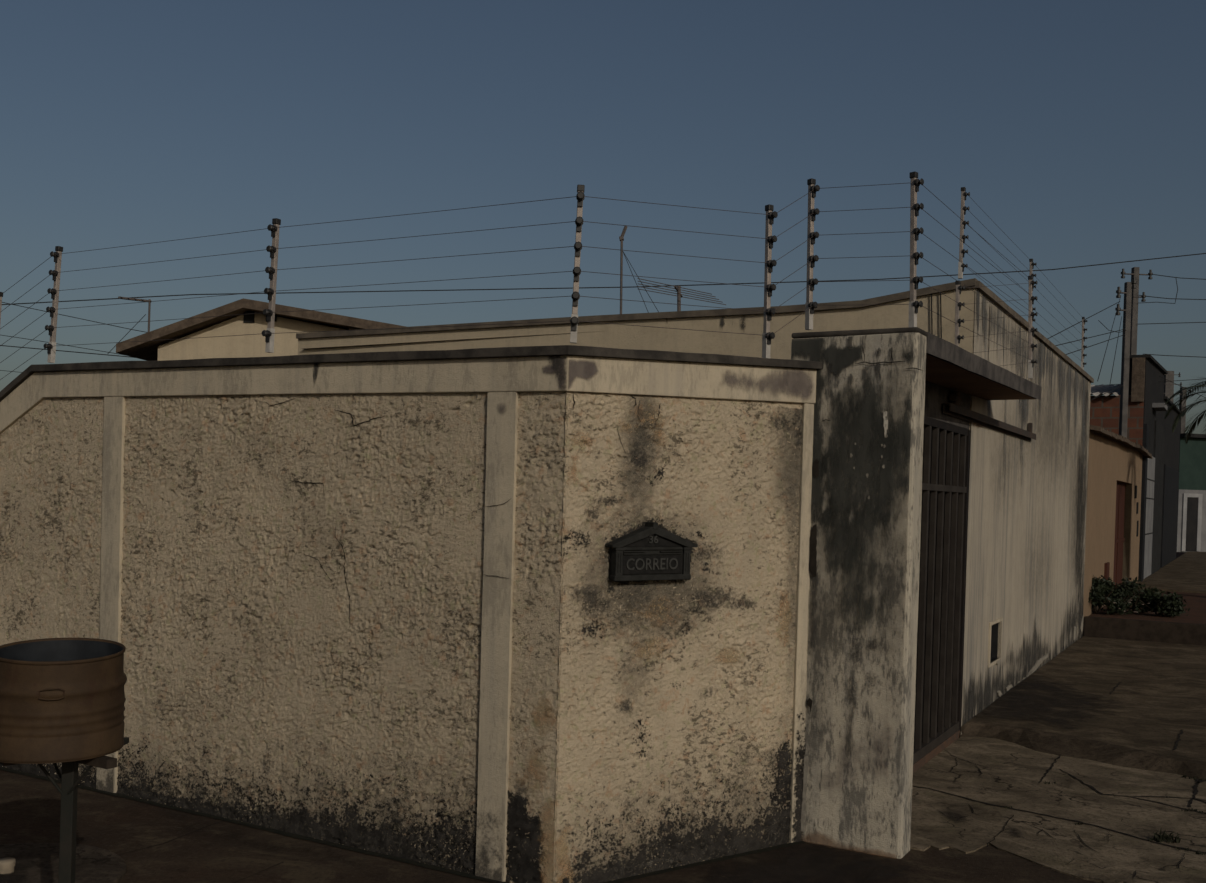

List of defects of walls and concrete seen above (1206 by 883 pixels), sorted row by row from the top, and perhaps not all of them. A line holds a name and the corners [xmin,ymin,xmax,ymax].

damp [543,355,598,389]
damp [630,449,666,485]
damp [563,496,621,556]
damp [962,289,1089,726]
crack [304,527,350,628]
damp [810,503,890,647]
damp [571,585,615,638]
damp [681,588,754,636]
damp [620,702,652,759]
damp [78,731,793,883]
crack [914,751,1206,879]